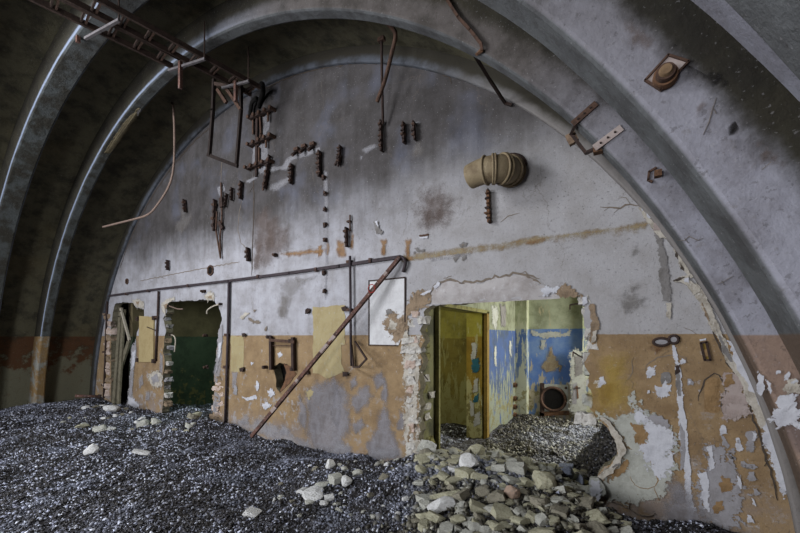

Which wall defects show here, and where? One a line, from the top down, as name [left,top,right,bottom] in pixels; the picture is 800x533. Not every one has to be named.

corrosion [257,219,353,266]
corrosion [403,229,604,262]
crack [602,197,638,213]
peeling [491,303,507,329]
spalling [209,324,276,421]
spalling [382,282,440,456]
peeling [470,342,481,427]
peeling [531,207,800,532]